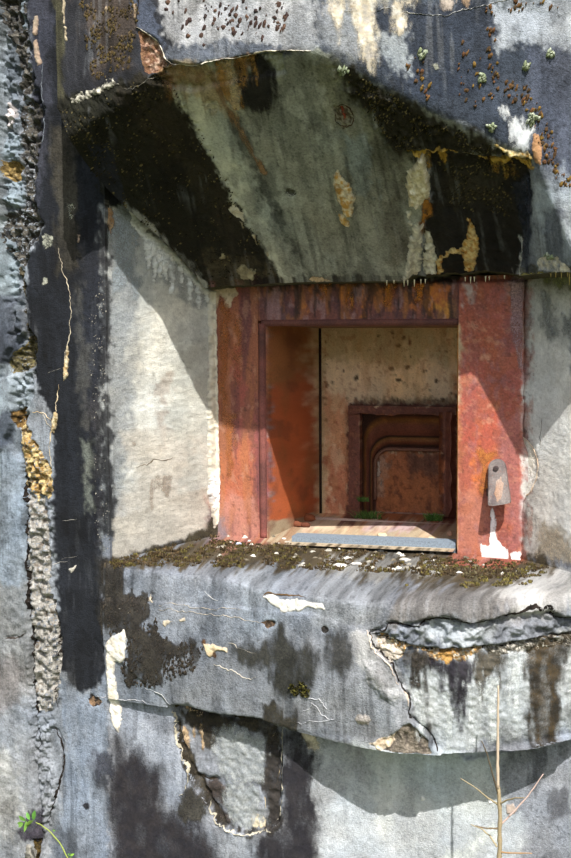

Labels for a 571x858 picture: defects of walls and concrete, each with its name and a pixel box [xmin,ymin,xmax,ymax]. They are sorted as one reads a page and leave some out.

efflorescence [70,78,119,104]
crack [32,248,72,476]
spalling [10,406,63,712]
leakage [142,518,218,553]
rust [293,513,316,527]
rust [478,449,504,502]
crack [5,474,65,822]
peeling [89,629,127,733]
leakage [99,560,204,689]
spalling [376,633,571,662]
leakage [95,622,352,858]
spalling [369,723,432,754]